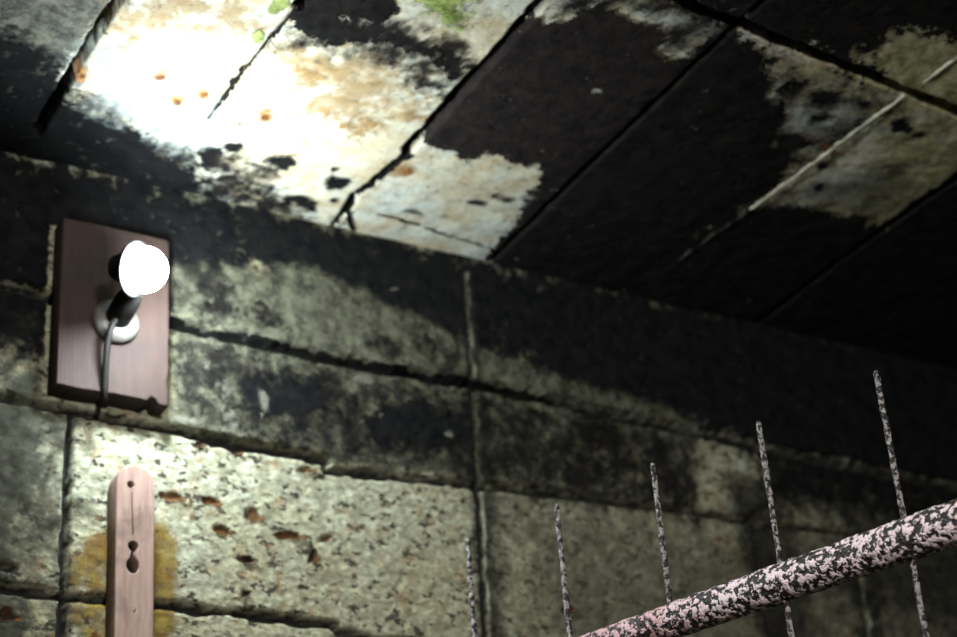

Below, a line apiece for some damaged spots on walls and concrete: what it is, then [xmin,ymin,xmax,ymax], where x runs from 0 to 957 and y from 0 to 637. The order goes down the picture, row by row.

corrosion [74,57,88,82]
damp [273,3,473,135]
damp [86,0,304,218]
corrosion [257,108,273,123]
damp [679,49,926,260]
damp [325,167,352,203]
spalling [158,492,187,502]
spalling [202,496,222,507]
spalling [244,505,265,522]
spalling [214,525,236,537]
spalling [274,530,336,563]
damp [153,523,177,637]